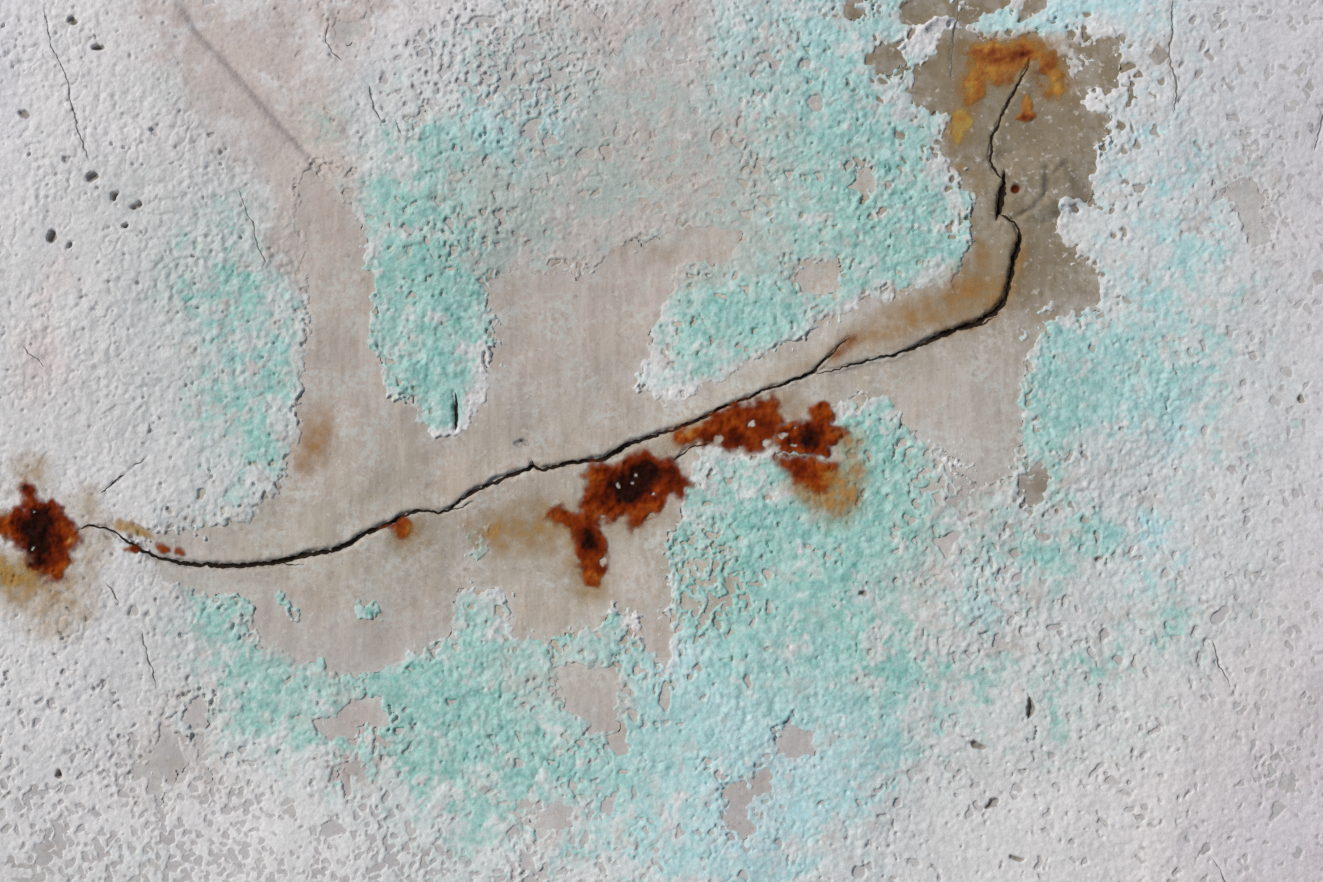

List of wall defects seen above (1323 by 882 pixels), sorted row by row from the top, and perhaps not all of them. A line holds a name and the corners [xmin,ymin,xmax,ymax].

rust [951,37,1066,143]
crack [80,61,1030,569]
flaking render [133,0,1126,679]
rust [0,474,82,611]
rust [115,521,184,556]
rust [483,395,864,594]
peeling [313,694,390,741]
peeling [554,662,630,734]
peeling [1027,697,1035,718]